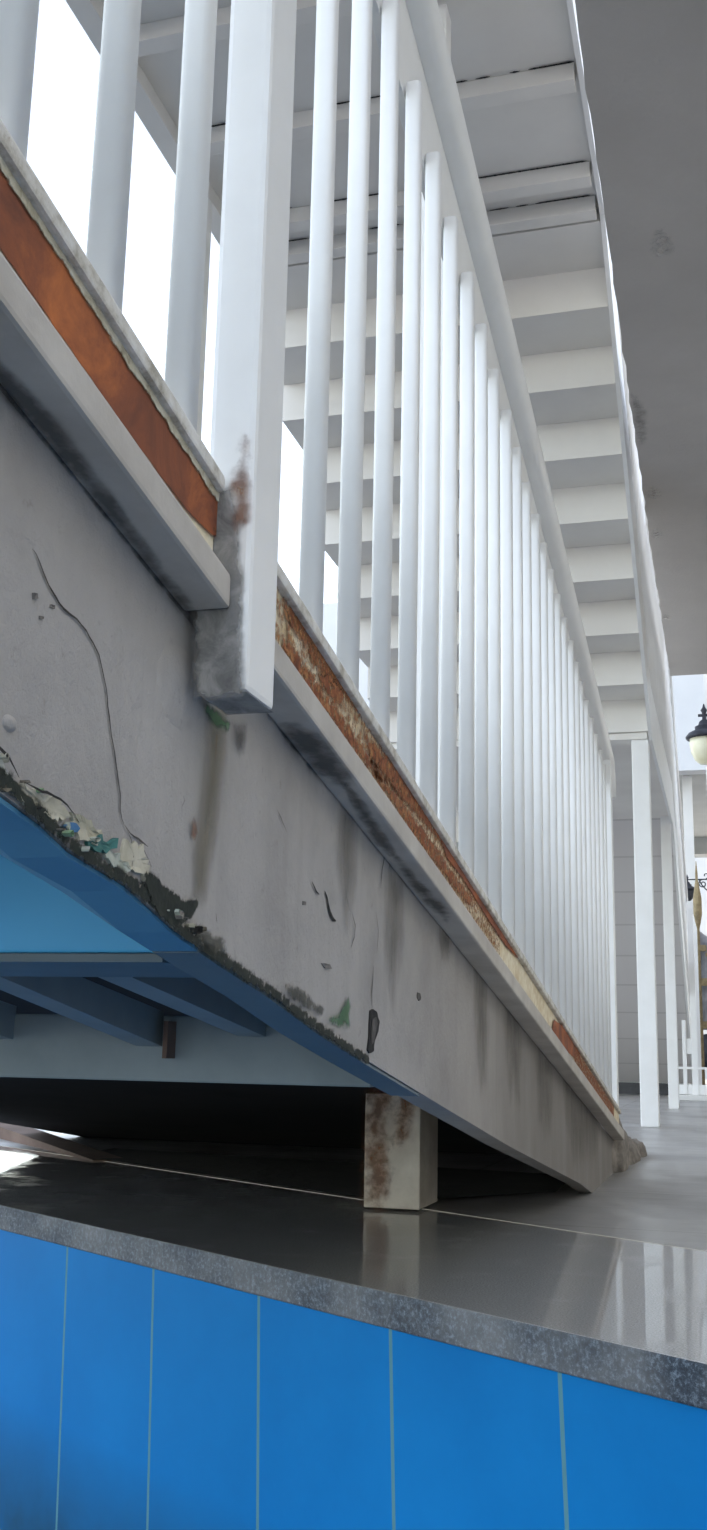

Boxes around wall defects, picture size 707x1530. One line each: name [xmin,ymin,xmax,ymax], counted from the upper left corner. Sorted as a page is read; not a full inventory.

rust [0,156,247,536]
crack [33,550,152,867]
flaking render [0,747,369,1064]
rust [275,597,519,959]
rust [366,1089,412,1198]
rust [552,1020,614,1116]